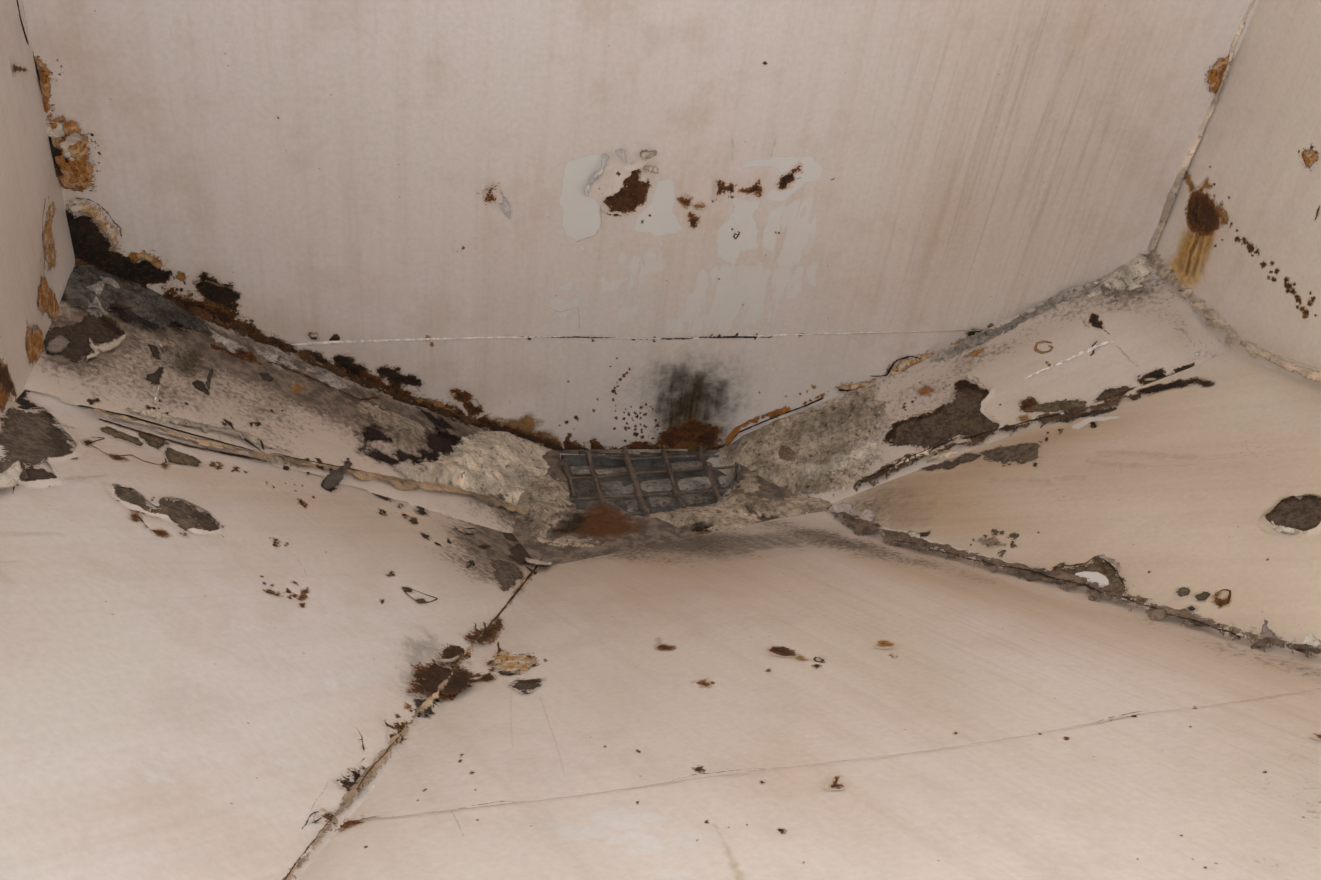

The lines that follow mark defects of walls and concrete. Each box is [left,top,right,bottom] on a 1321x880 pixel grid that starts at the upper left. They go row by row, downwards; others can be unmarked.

rust [1204,54,1233,93]
rust [1298,145,1318,171]
rust [1164,166,1317,319]
crack [661,334,771,342]
damp [1087,250,1259,358]
peeling [0,389,201,491]
damp [354,330,983,563]
peeling [881,374,1132,471]
peeling [102,482,230,538]
spalling [1256,492,1321,539]
crack [492,558,542,622]
crack [284,792,331,880]